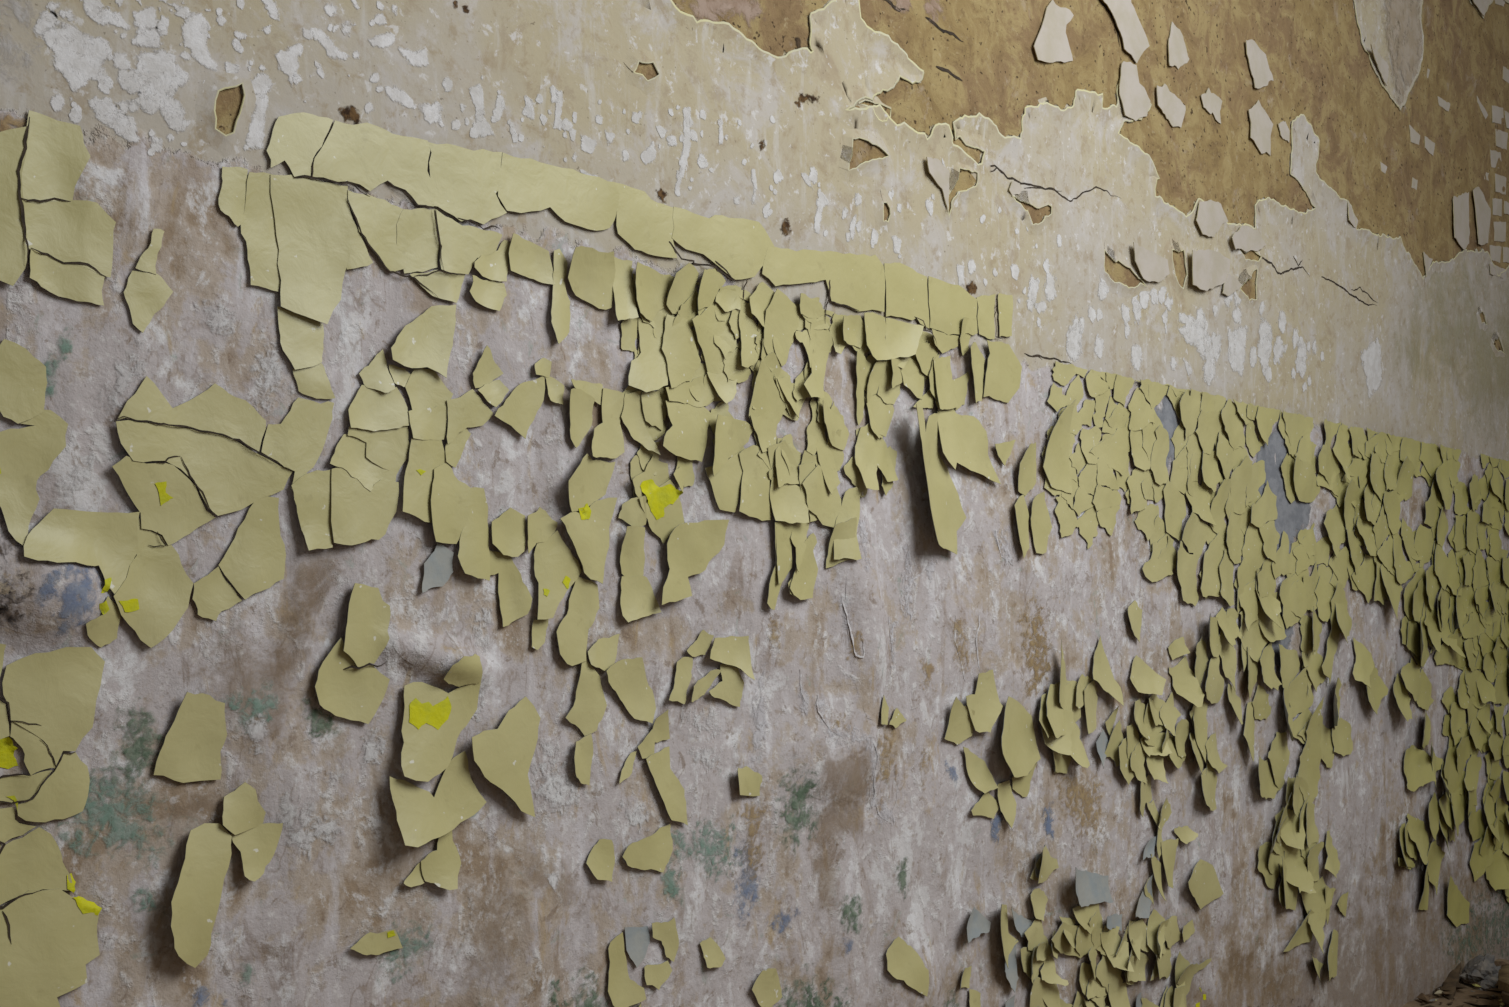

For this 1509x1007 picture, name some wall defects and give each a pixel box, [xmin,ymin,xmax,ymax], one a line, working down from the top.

spalling [605,0,1509,311]
water stain [250,340,295,413]
peeling [0,68,1022,1007]
water stain [0,542,100,634]
peeling [944,361,1509,1007]
crack [0,697,75,804]
water stain [361,728,386,768]
water stain [277,792,344,859]
crack [0,890,41,944]